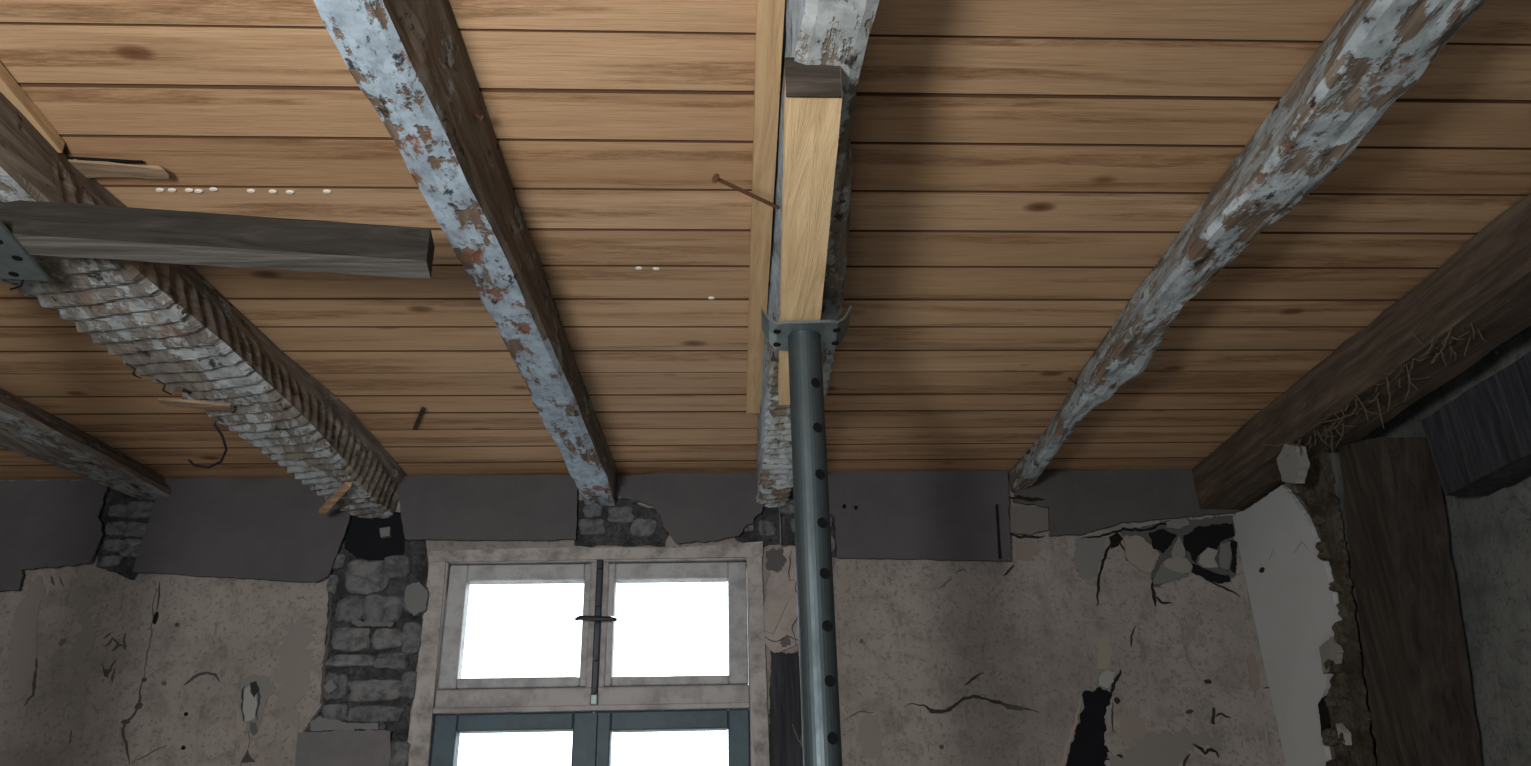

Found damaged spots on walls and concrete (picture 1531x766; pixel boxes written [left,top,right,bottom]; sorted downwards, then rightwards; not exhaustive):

flaking render [96,487,155,580]
peeling [735,487,799,656]
crack [1009,495,1045,539]
spalling [1074,515,1238,587]
crack [1203,577,1240,597]
crack [1076,523,1171,760]
crack [844,672,1039,720]
spalling [1060,670,1123,766]